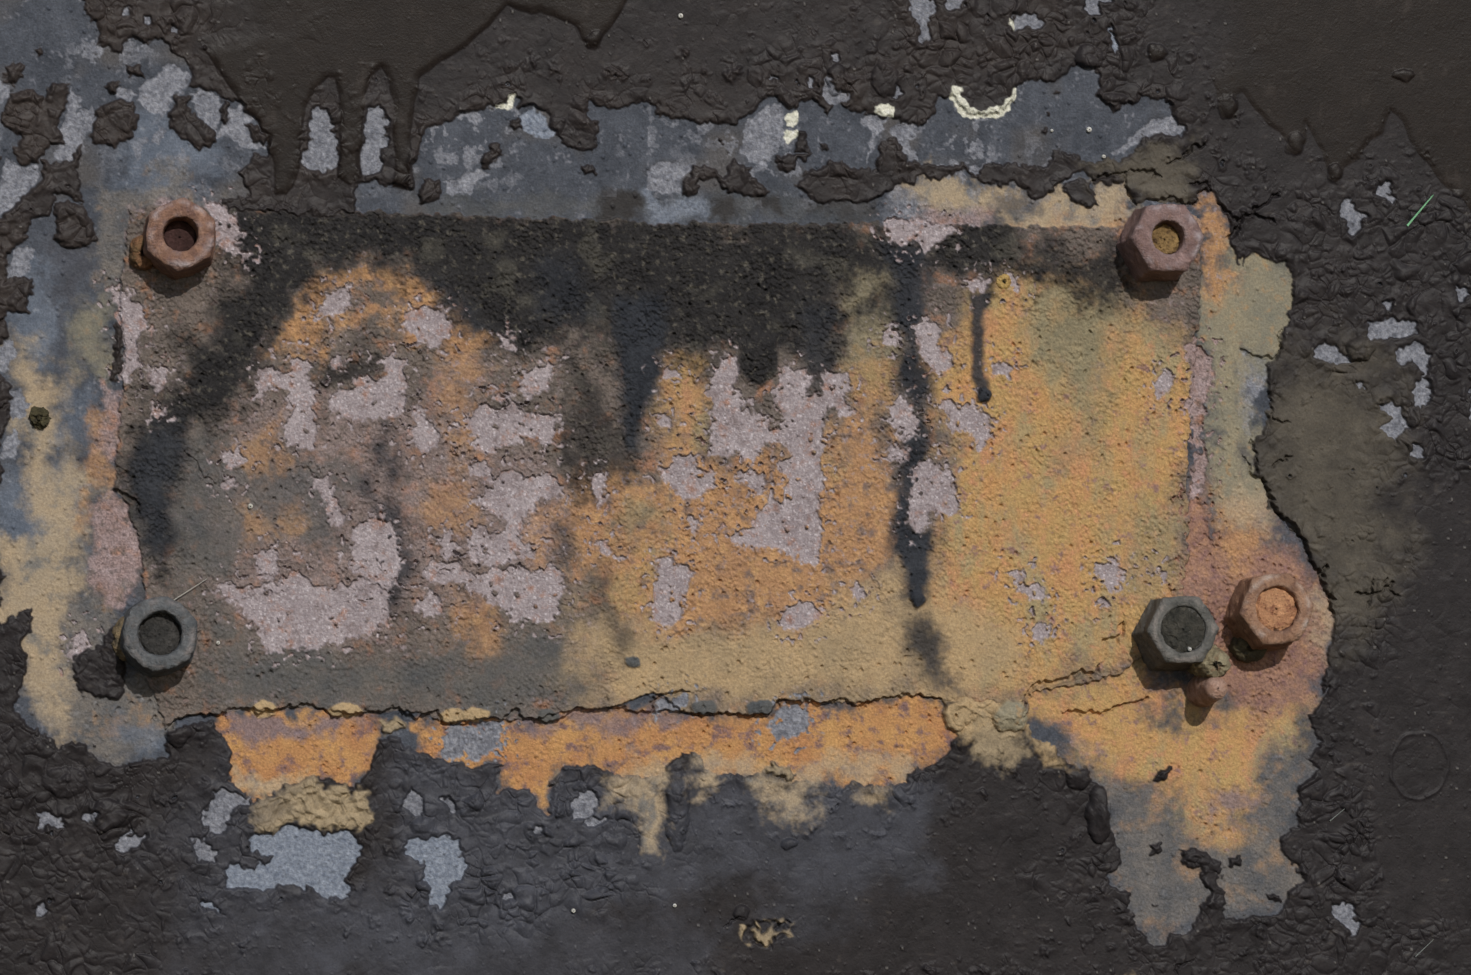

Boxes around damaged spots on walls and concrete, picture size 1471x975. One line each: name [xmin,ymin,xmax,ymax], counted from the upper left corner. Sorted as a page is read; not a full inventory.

peeling [647,103,829,198]
peeling [950,86,1017,120]
peeling [0,48,277,484]
corrosion [265,264,435,367]
corrosion [0,157,382,803]
corrosion [415,326,512,538]
corrosion [466,136,1424,856]
corrosion [410,717,445,757]
crack [164,690,943,733]
crack [1022,617,1149,720]
peeling [191,787,367,900]
peeling [405,835,469,910]